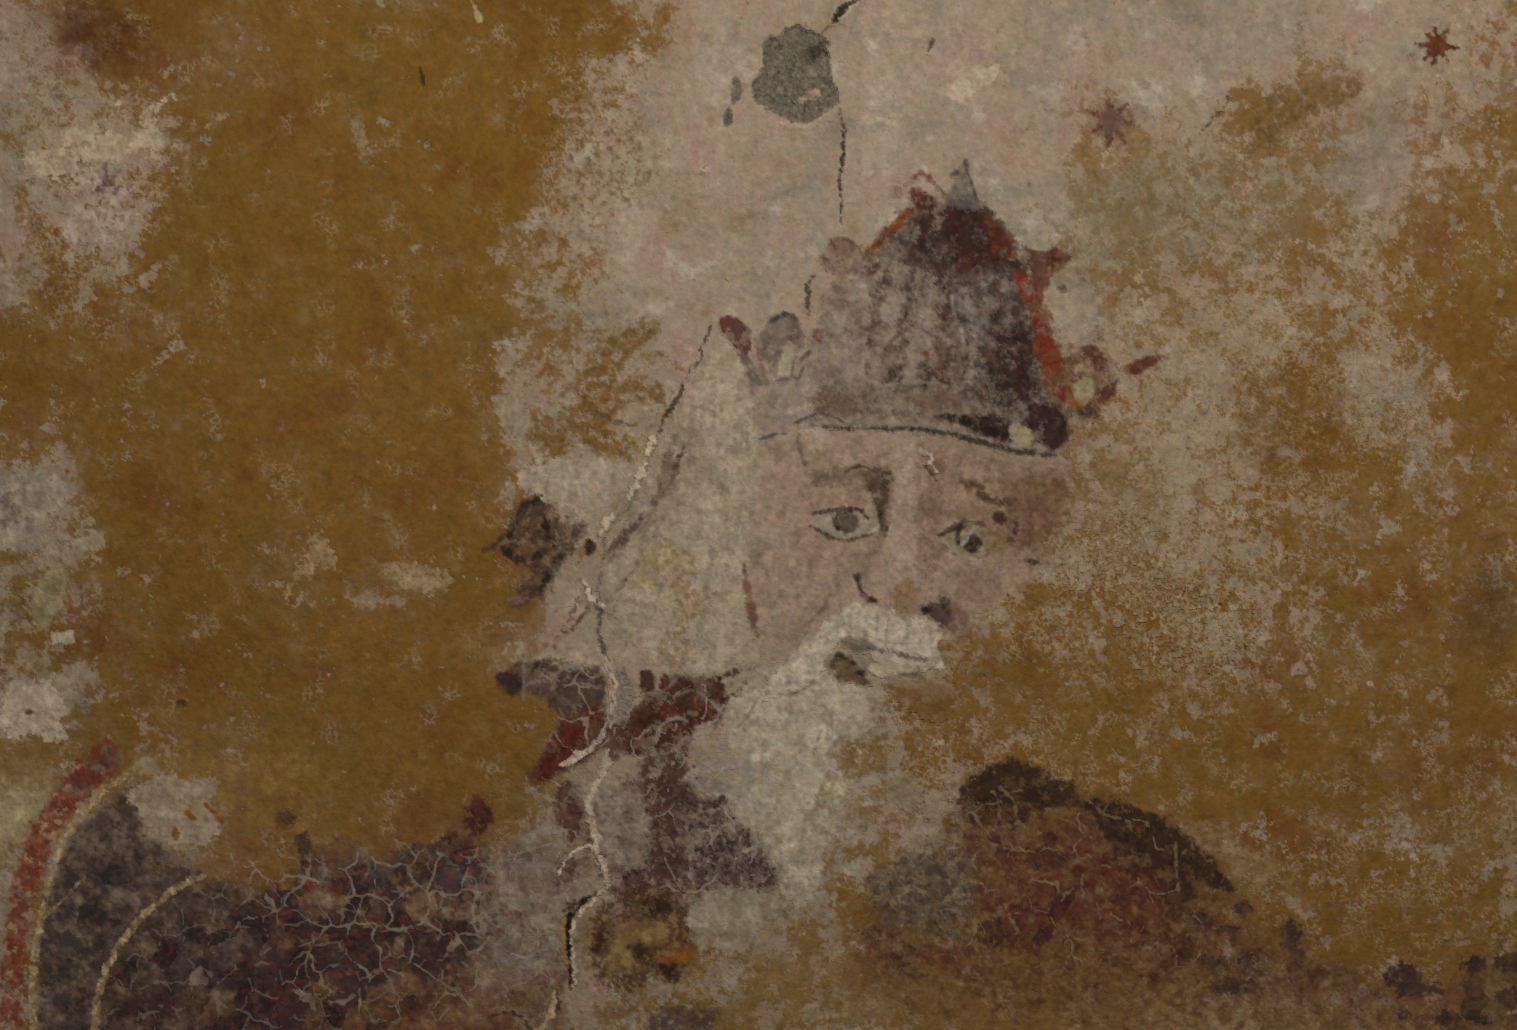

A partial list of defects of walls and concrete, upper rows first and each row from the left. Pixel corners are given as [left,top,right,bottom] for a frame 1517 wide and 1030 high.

crack [821,0,863,35]
crack [835,102,851,225]
water stain [1086,152,1206,294]
water stain [1239,65,1368,161]
water stain [1227,361,1356,489]
water stain [1440,546,1517,665]
crack [97,325,779,1030]